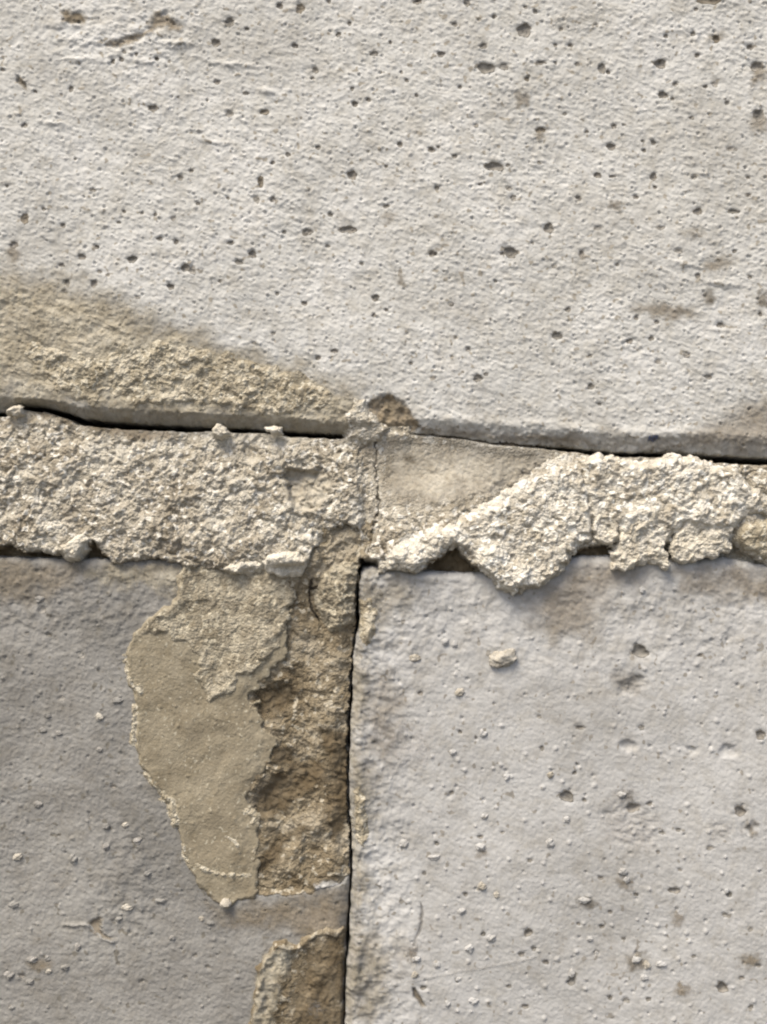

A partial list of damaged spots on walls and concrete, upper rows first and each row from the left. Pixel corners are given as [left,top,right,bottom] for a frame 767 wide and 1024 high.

crack [42,412,191,433]
crack [373,441,381,517]
crack [419,434,549,450]
crack [708,458,767,466]
crack [308,578,320,621]
spalling [243,520,373,897]